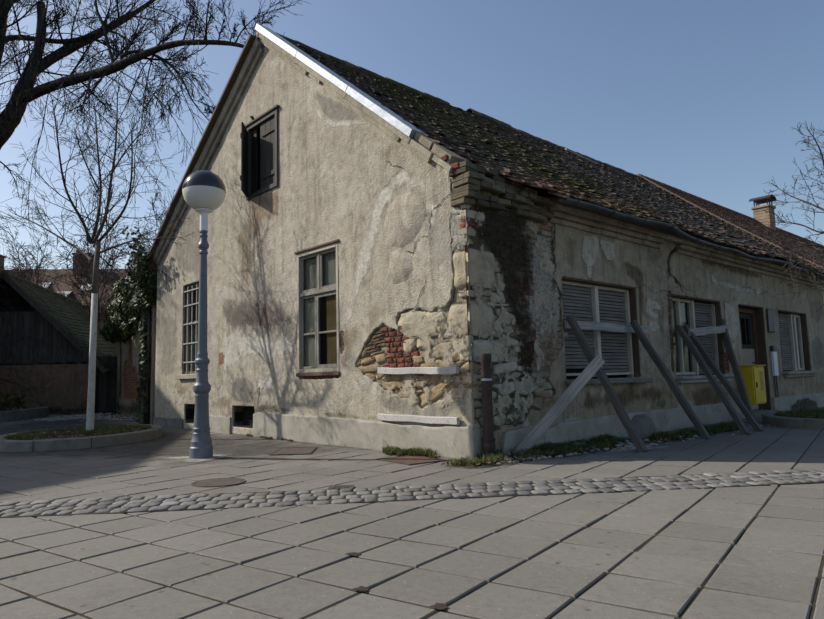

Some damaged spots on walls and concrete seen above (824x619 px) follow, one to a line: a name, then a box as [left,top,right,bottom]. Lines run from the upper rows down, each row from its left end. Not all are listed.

crack [407,185,452,253]
peeling [582,235,615,278]
crack [633,248,716,307]
spalling [356,204,568,429]
peeling [646,291,675,372]